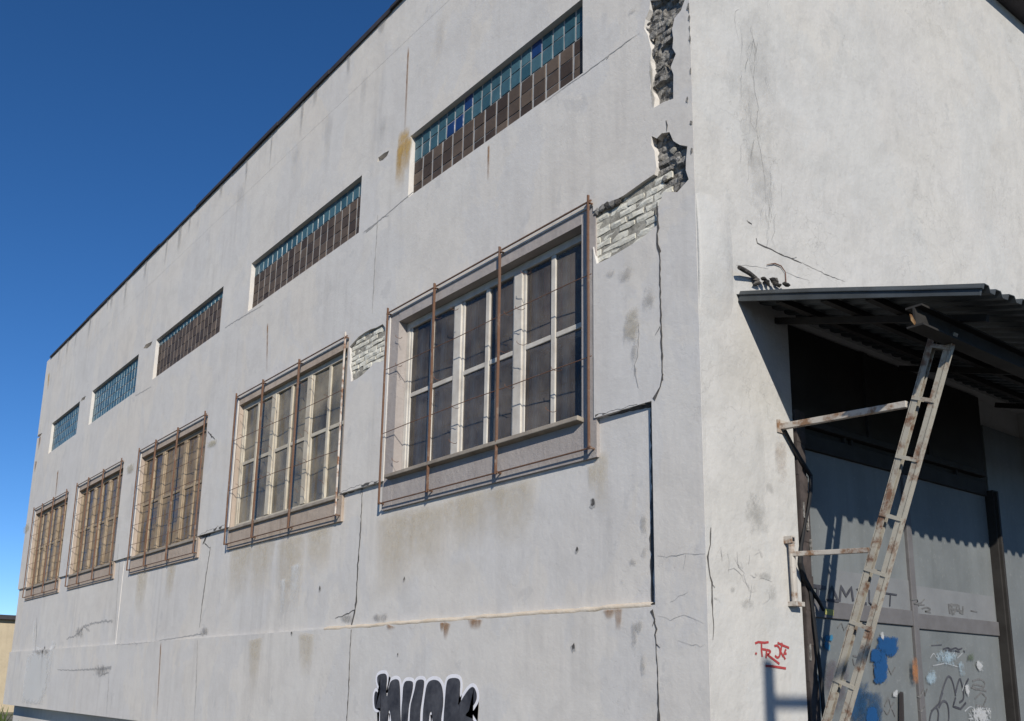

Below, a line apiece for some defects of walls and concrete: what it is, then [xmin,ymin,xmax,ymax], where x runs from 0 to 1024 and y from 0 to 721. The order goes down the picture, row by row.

corrosion [397,133,411,159]
flaking render [593,133,693,262]
spalling [647,0,691,104]
crack [735,9,843,281]
flaking render [351,325,385,380]
crack [634,203,663,400]
crack [35,525,227,719]
crack [336,498,362,721]
crack [650,529,772,721]